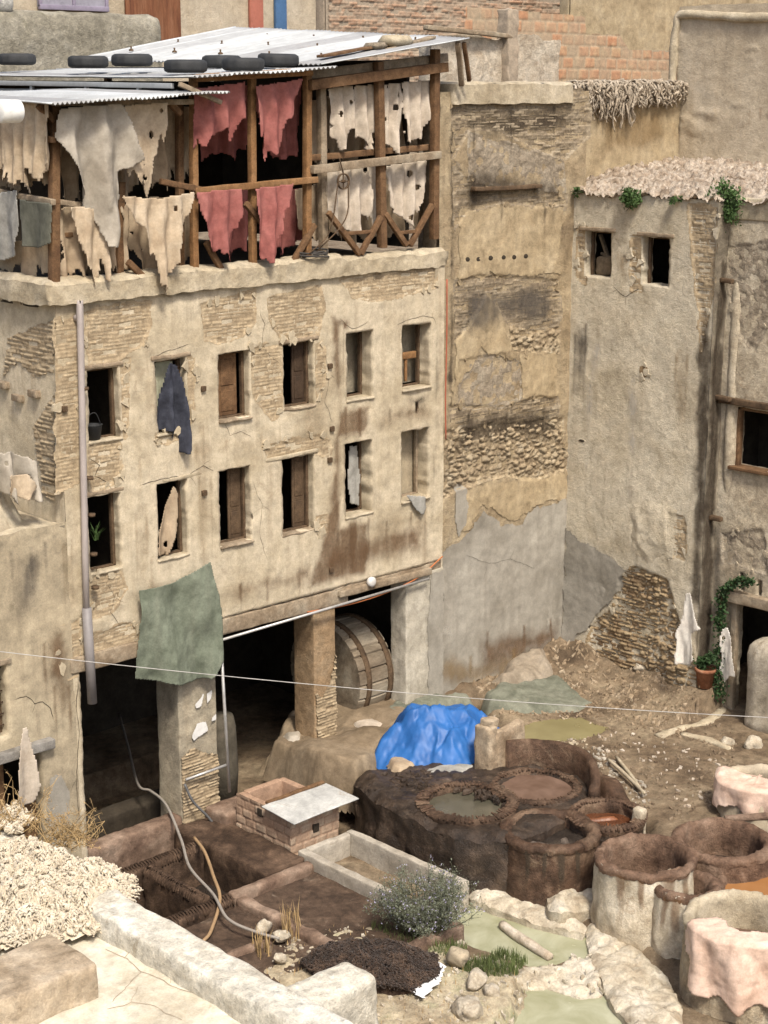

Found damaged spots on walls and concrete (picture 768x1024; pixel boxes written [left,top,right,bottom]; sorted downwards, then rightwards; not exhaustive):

flaking render [200,285,331,422]
damp [471,291,549,325]
flaking render [686,202,768,352]
damp [338,409,366,436]
damp [692,263,726,668]
damp [313,474,418,584]
flaking render [54,569,140,681]
crack [17,690,80,815]